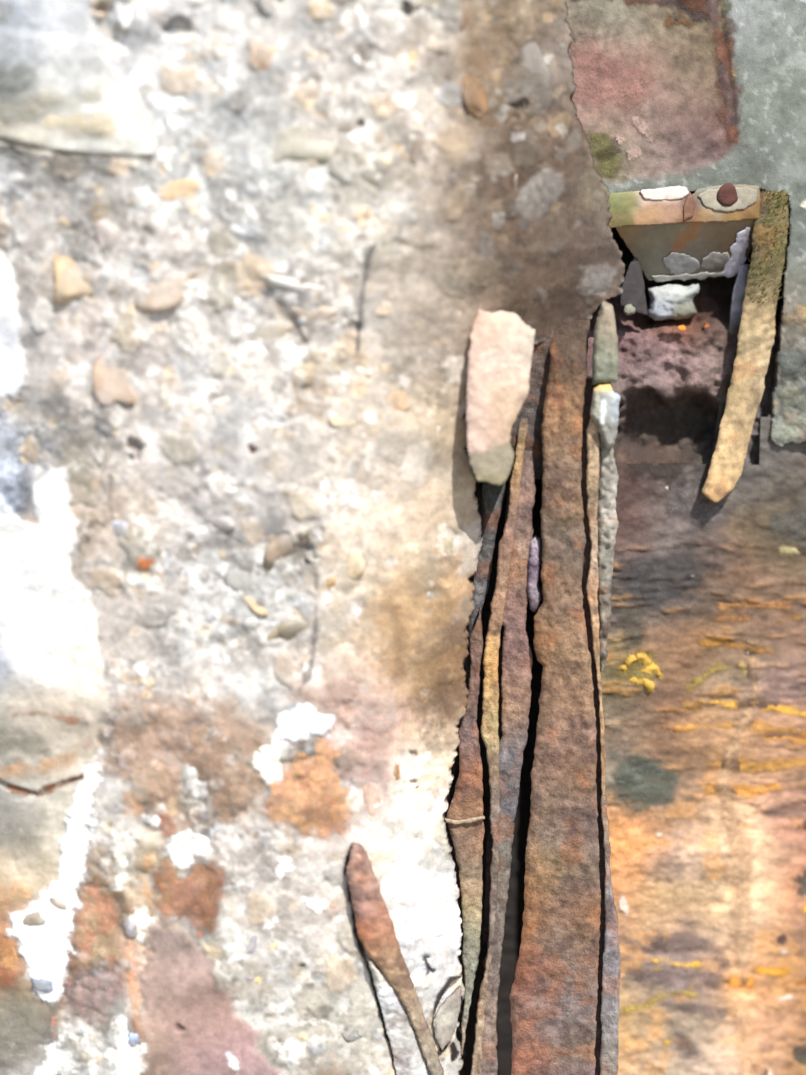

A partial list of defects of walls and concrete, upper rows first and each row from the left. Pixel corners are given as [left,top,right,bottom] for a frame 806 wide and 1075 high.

rust [573,48,652,177]
rust [625,0,743,142]
peeling [640,186,765,221]
spalling [606,227,753,467]
spalling [743,194,806,465]
spalling [0,0,634,1075]
rust [444,319,806,1075]
rust [157,809,175,837]
rust [265,738,350,838]
rust [145,855,224,935]
crack [424,957,464,1021]
crack [437,1042,459,1061]